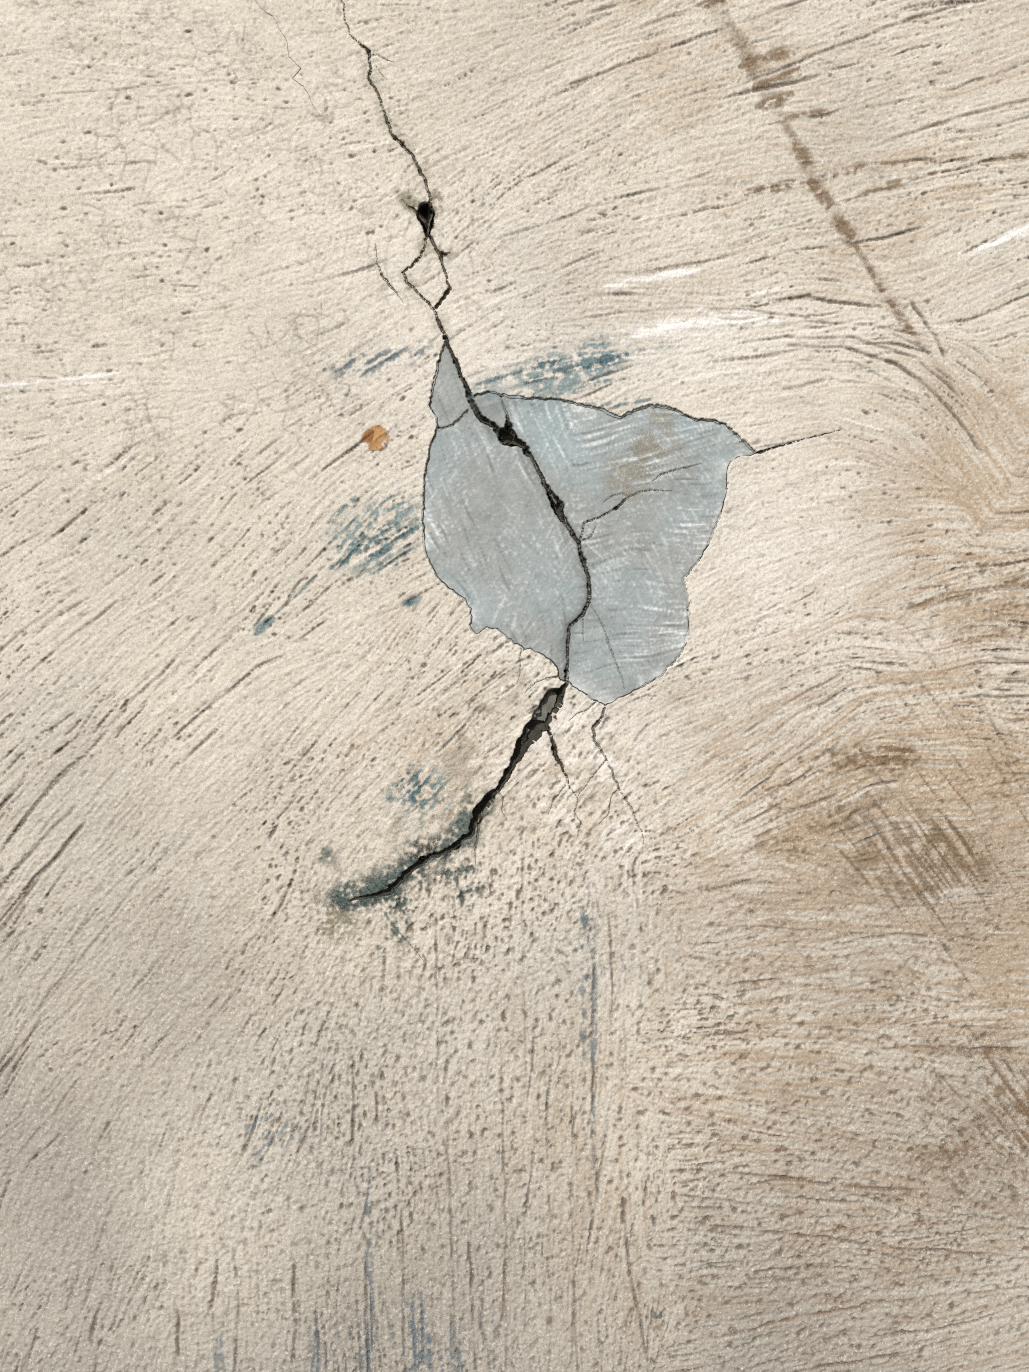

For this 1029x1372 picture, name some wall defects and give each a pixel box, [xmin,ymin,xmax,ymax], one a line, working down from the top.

corrosion [362,425,389,451]
crack [341,0,701,902]
peeling [421,341,759,705]